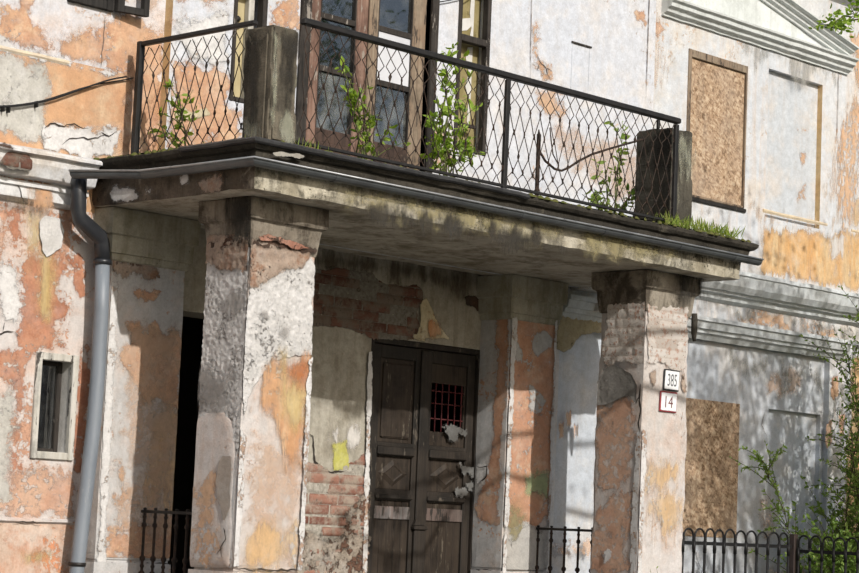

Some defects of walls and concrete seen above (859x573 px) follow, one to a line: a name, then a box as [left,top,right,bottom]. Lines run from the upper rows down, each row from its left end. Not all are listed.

peeling [0,0,242,159]
leakage [245,36,260,124]
leakage [280,32,300,107]
peeling [532,22,566,117]
peeling [828,33,859,259]
leakage [369,204,469,237]
leakage [390,261,471,296]
leakage [481,221,542,253]
leakage [679,274,704,304]
peeling [97,260,182,562]
flaking render [190,234,449,573]
peeling [475,301,689,573]